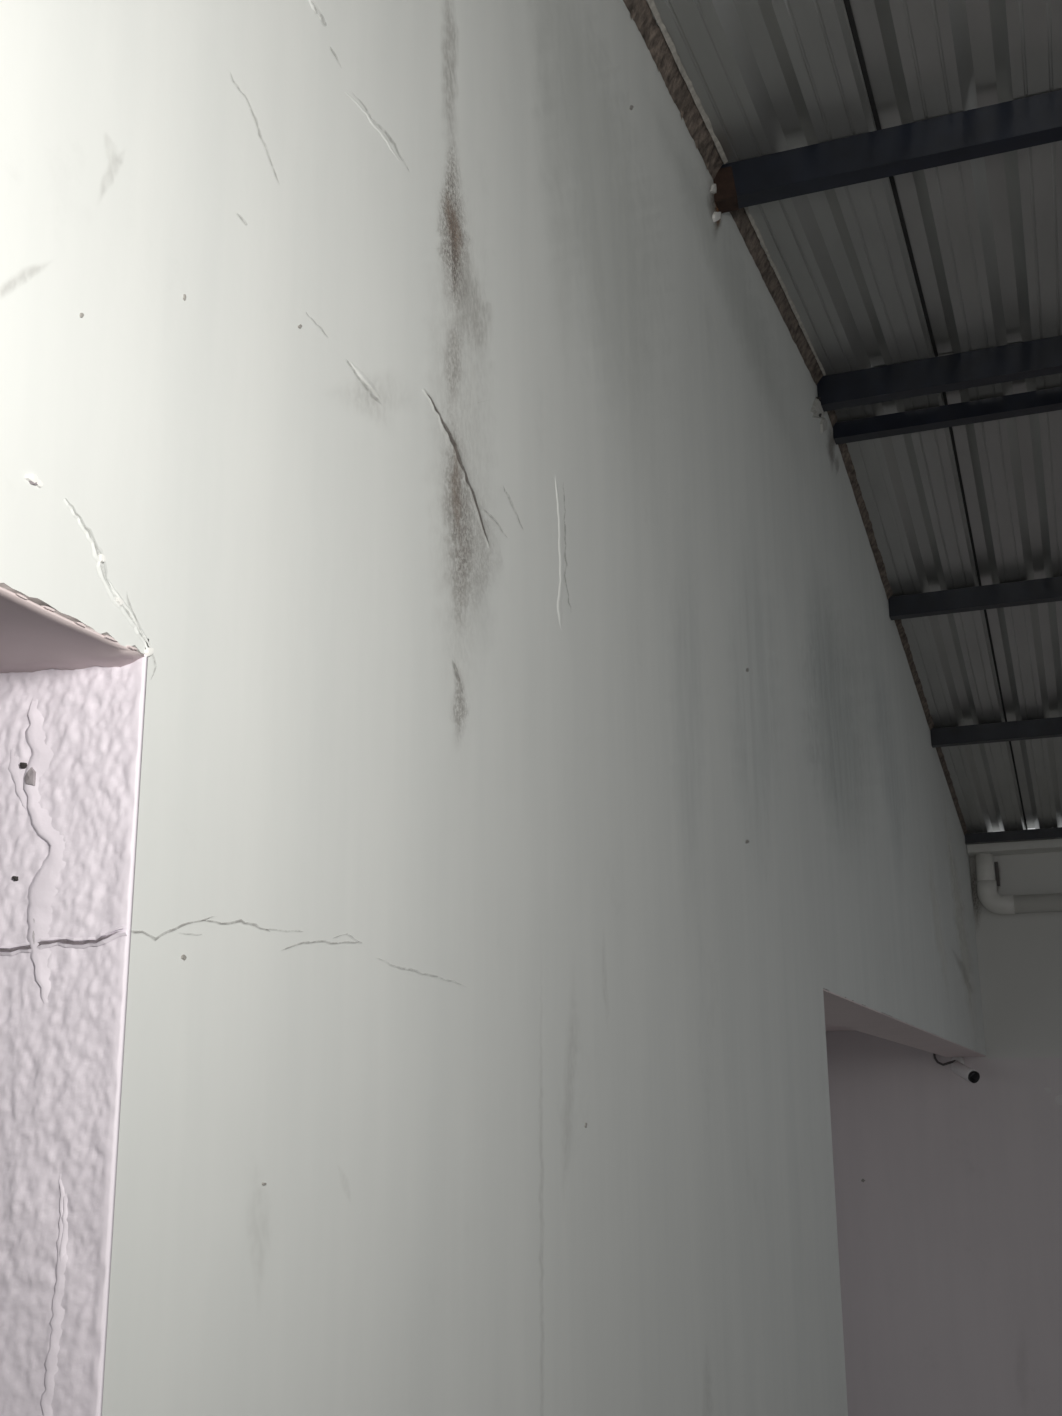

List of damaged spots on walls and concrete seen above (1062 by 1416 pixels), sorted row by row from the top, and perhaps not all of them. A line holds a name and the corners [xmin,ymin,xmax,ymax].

damp [445,176,461,274]
crack [422,388,490,548]
crack [64,499,154,657]
crack [0,926,127,956]